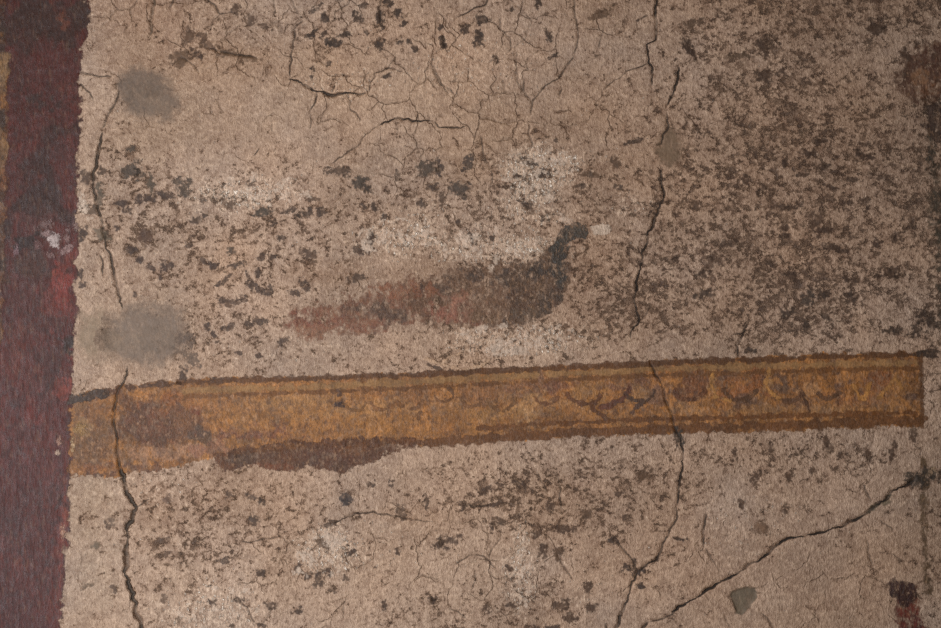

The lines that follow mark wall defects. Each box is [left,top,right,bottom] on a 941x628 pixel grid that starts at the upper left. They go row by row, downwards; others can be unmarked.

crack [289,22,464,163]
crack [522,7,578,112]
crack [608,0,680,144]
crack [80,73,123,308]
crack [630,169,665,337]
crack [113,368,143,628]
crack [605,365,913,628]